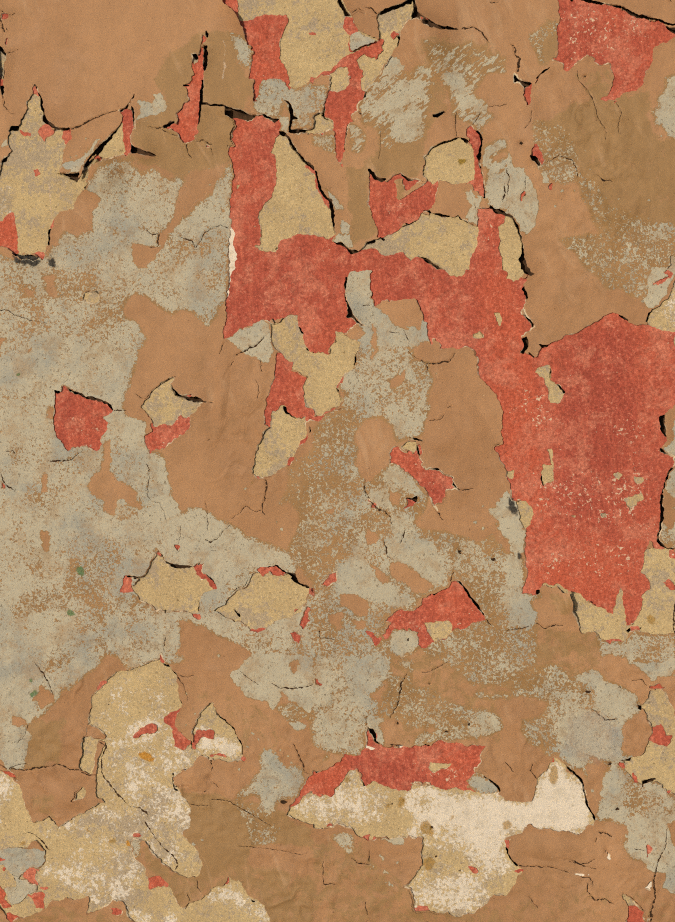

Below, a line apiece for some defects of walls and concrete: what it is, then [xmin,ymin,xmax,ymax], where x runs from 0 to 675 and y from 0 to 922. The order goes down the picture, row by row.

crack [69,110,117,131]
peeling [0,85,299,922]
peeling [163,0,675,917]